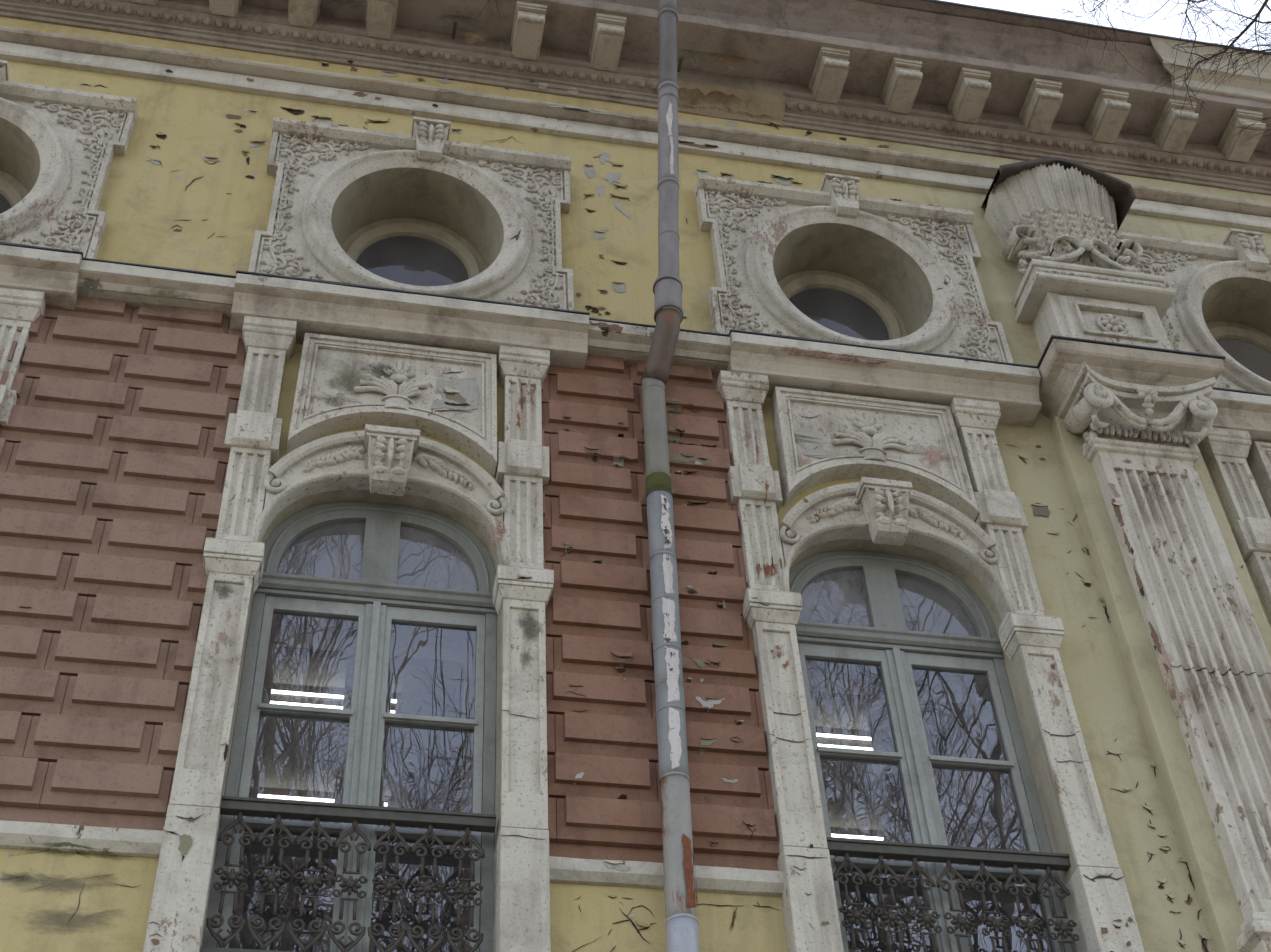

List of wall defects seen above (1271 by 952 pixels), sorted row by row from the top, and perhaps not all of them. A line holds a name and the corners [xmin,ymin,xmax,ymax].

peeling [148,132,167,168]
peeling [226,109,267,179]
peeling [666,102,718,174]
spalling [576,281,627,337]
spalling [1031,503,1050,518]
peeling [660,494,727,769]
crack [1171,665,1266,676]
rust [682,833,698,908]
leakage [3,875,97,928]
crack [572,895,656,952]
spalling [1101,916,1133,952]
peeling [1157,878,1209,952]